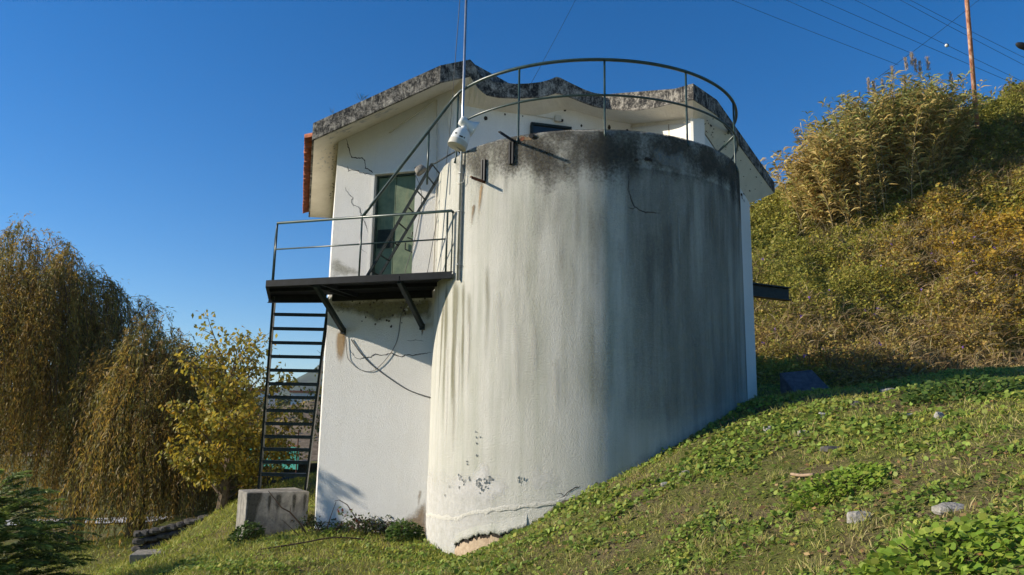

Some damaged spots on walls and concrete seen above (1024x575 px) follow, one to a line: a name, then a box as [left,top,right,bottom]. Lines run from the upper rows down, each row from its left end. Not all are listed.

crack [345,139,373,252]
crack [628,174,660,213]
peeling [426,431,527,556]